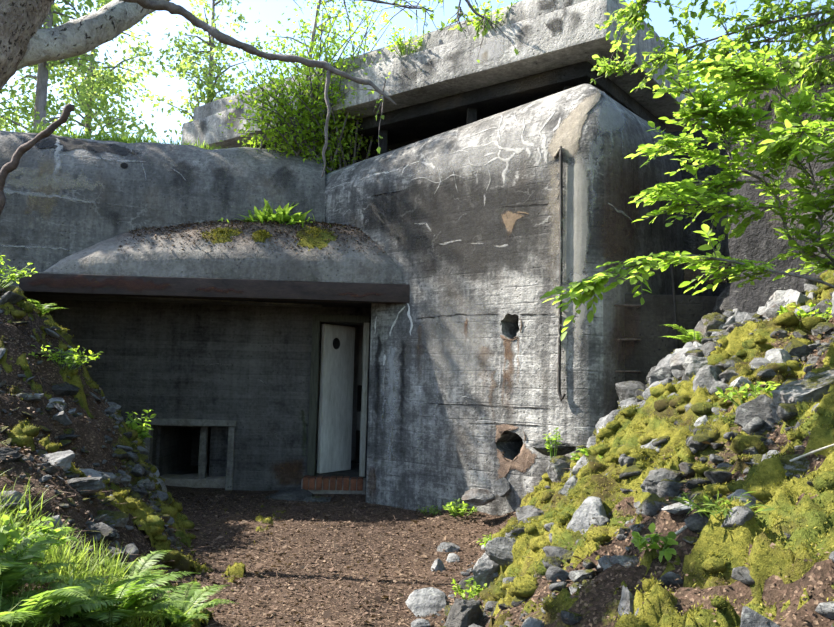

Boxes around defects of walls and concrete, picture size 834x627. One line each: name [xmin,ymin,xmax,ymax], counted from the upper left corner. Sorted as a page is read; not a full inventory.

crack [331,111,561,197]
leakage [364,175,539,277]
spalling [502,211,528,232]
crack [502,201,547,209]
leakage [549,166,559,251]
peeling [548,88,601,370]
leakage [374,303,413,419]
rust [503,338,519,386]
spalling [496,424,537,479]